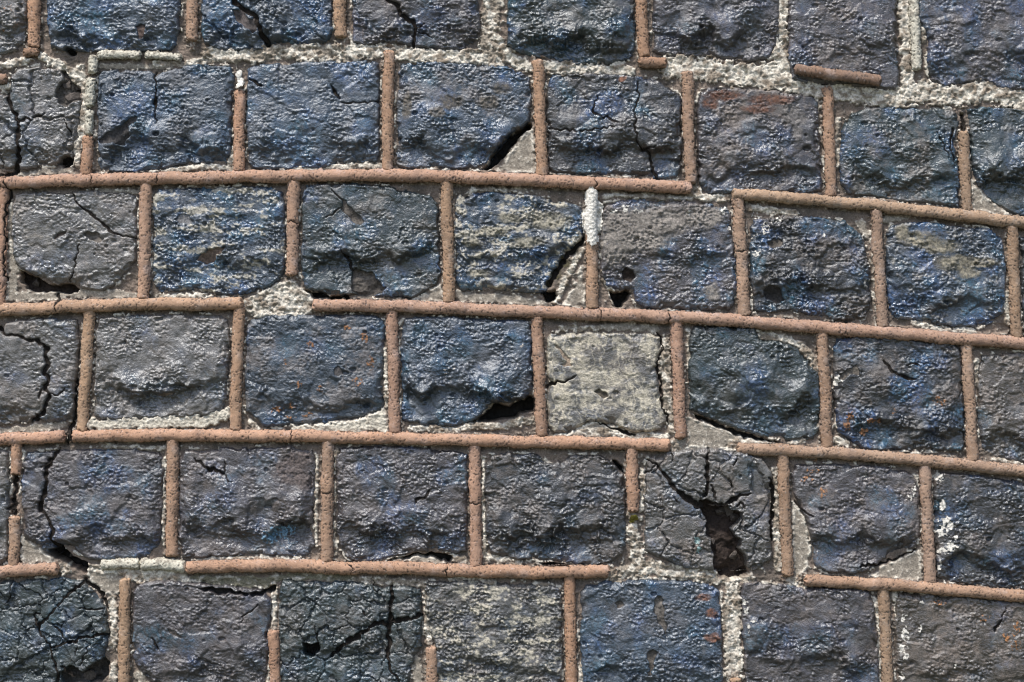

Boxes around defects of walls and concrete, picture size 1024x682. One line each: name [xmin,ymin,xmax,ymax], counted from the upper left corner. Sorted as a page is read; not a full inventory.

crack [72,174,137,239]
crack [549,239,584,284]
damp [463,186,731,266]
crack [0,326,79,547]
spalling [699,499,747,577]
crack [645,449,811,540]
crack [34,579,108,682]
crack [315,563,421,682]